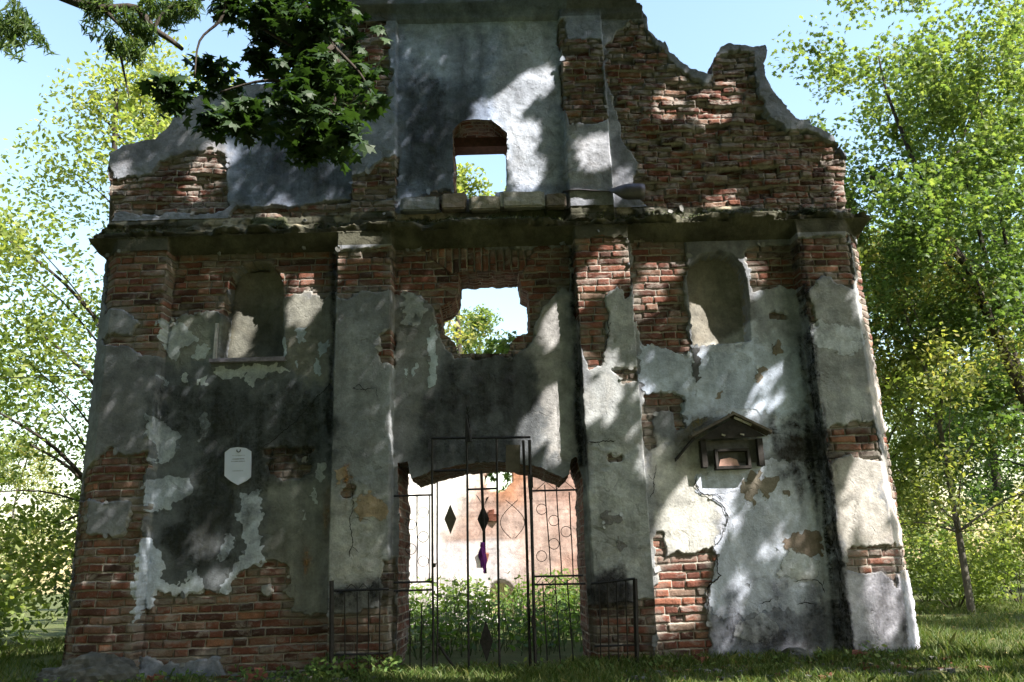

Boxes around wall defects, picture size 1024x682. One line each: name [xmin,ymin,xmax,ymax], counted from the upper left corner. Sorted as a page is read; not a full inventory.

spalling [109,147,400,222]
spalling [557,20,851,215]
spalling [63,413,399,682]
water stain [149,253,336,567]
crack [349,481,370,557]
peeling [104,230,906,664]
crack [694,476,728,614]
water stain [712,242,872,655]